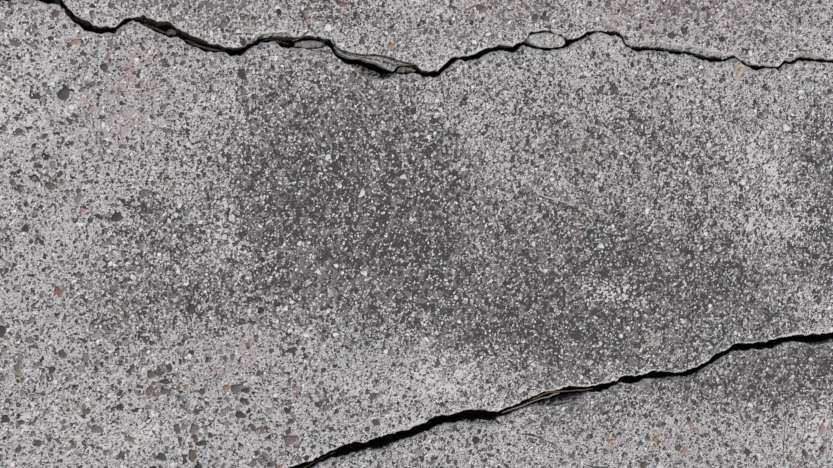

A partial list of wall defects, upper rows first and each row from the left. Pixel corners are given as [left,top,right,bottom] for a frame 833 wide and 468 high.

crack [242,80,252,182]
crack [39,0,833,134]
crack [288,332,833,468]